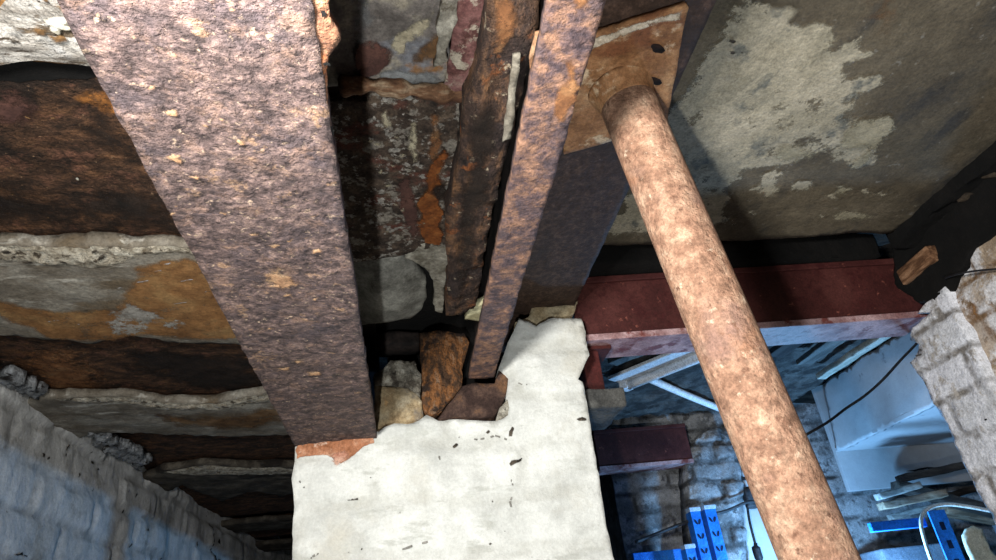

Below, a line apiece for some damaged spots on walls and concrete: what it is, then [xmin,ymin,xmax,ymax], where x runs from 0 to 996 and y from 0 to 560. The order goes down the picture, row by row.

corrosion [312,0,341,104]
corrosion [413,35,438,63]
corrosion [494,0,514,53]
corrosion [77,91,115,114]
corrosion [554,62,580,122]
corrosion [266,268,298,297]